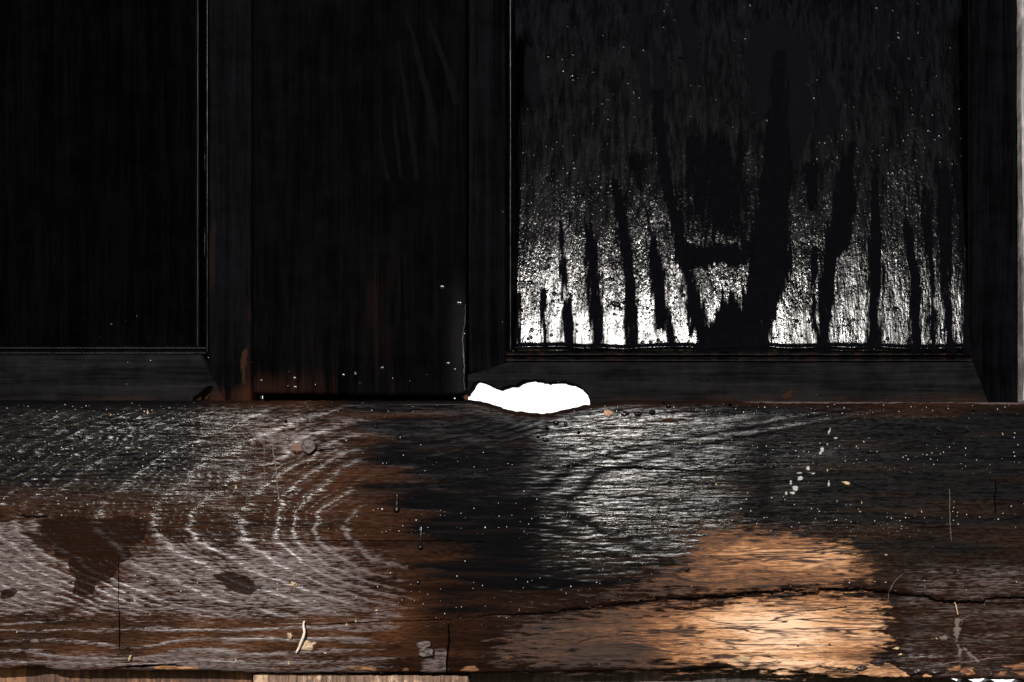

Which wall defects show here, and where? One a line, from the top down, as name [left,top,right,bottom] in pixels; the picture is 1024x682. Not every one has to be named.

leakage [0,588,17,599]
leakage [40,516,147,595]
leakage [213,571,261,595]
crack [307,587,1024,672]